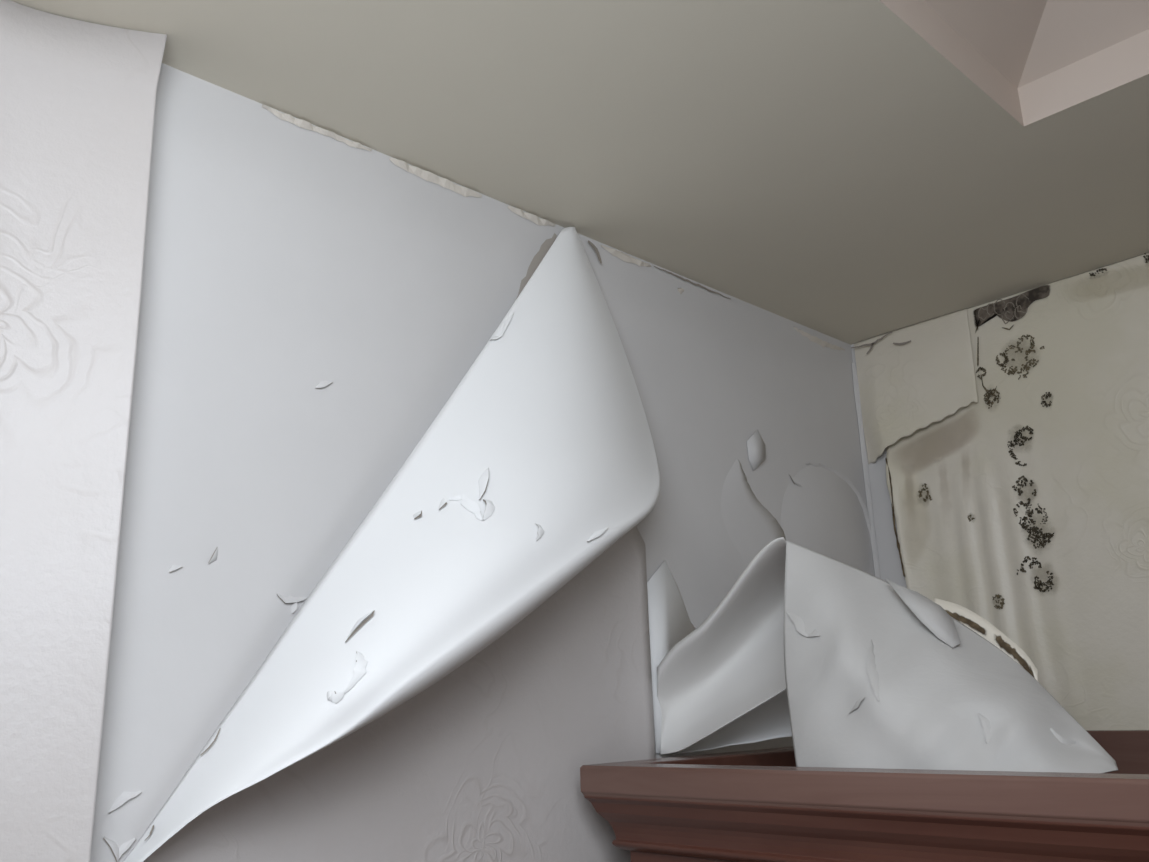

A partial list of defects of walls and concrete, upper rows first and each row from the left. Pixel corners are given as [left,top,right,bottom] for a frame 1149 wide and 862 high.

peeling [123,227,661,862]
peeling [854,309,978,464]
damp [885,253,1149,730]